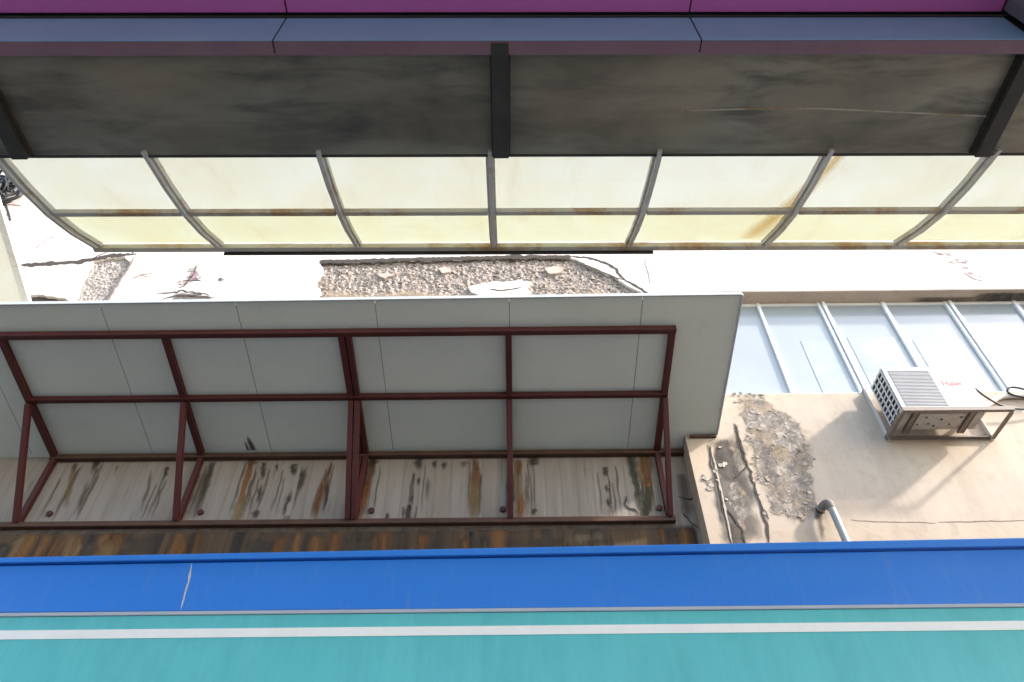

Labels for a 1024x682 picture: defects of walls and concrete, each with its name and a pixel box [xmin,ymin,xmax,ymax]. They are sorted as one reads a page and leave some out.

corrosion [816,156,842,185]
corrosion [751,190,801,236]
spalling [31,259,130,301]
spalling [316,254,648,301]
peeling [731,392,817,521]
corrosion [0,456,698,558]